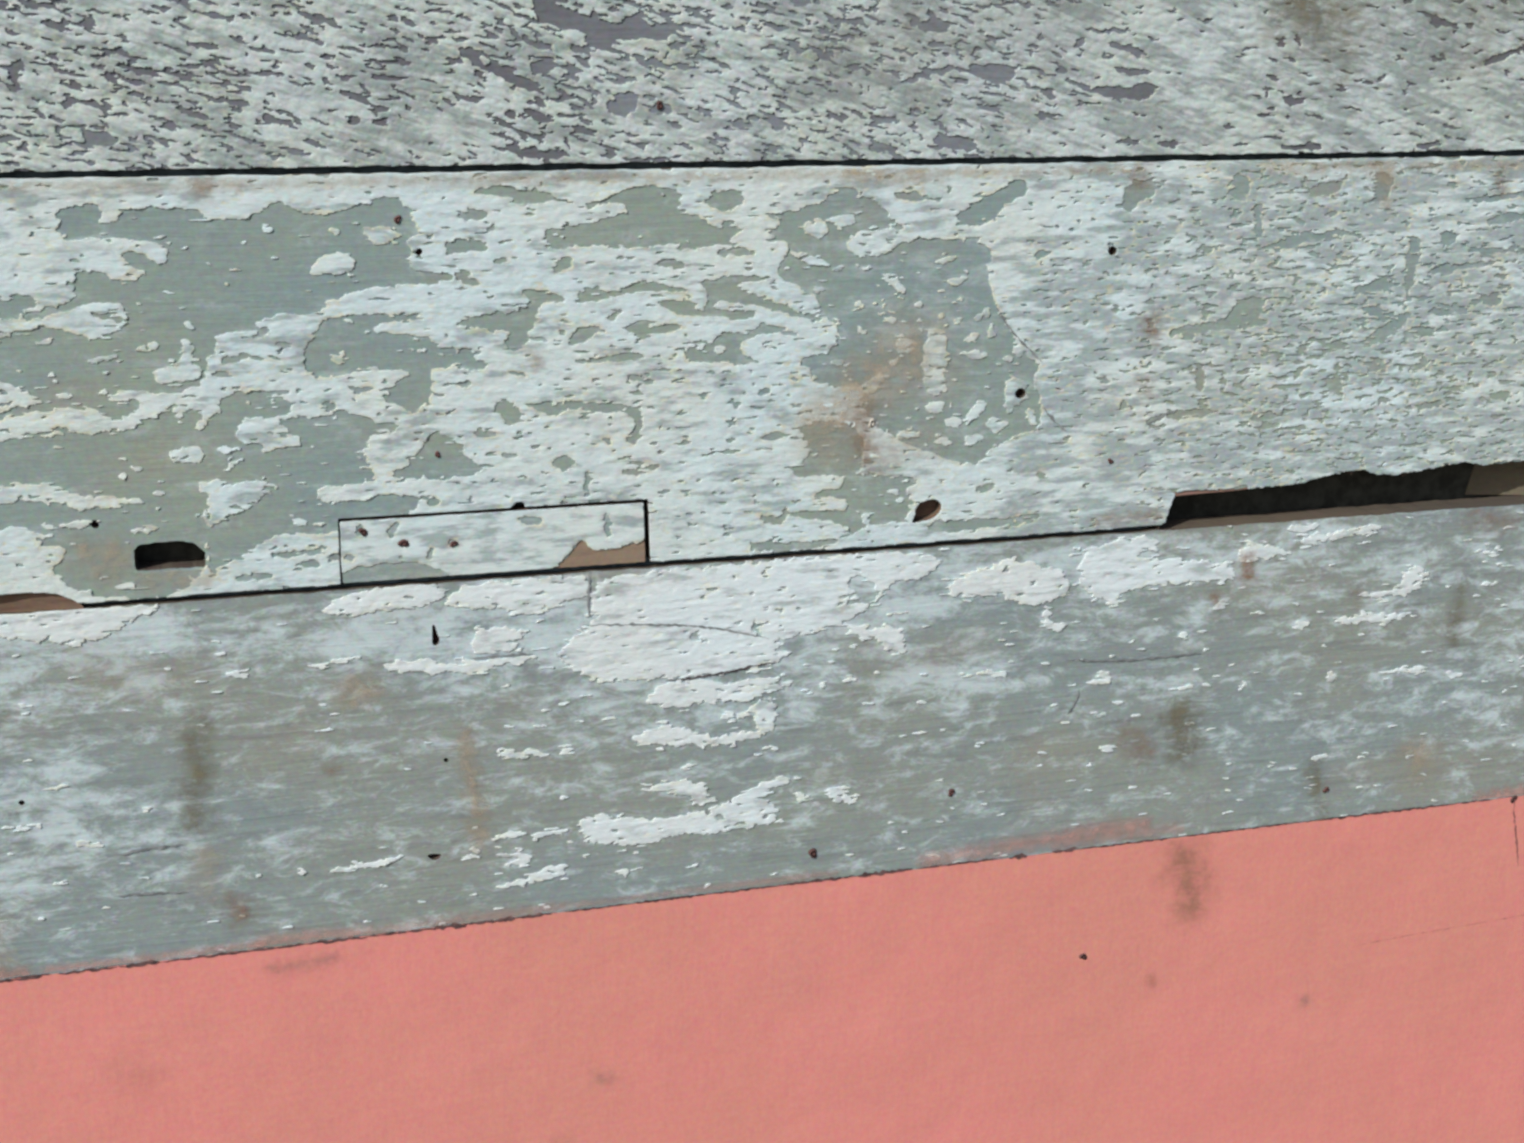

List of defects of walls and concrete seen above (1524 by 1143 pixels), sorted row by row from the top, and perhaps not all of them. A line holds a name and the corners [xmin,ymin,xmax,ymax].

peeling [0,0,1524,889]
crack [0,799,1524,982]